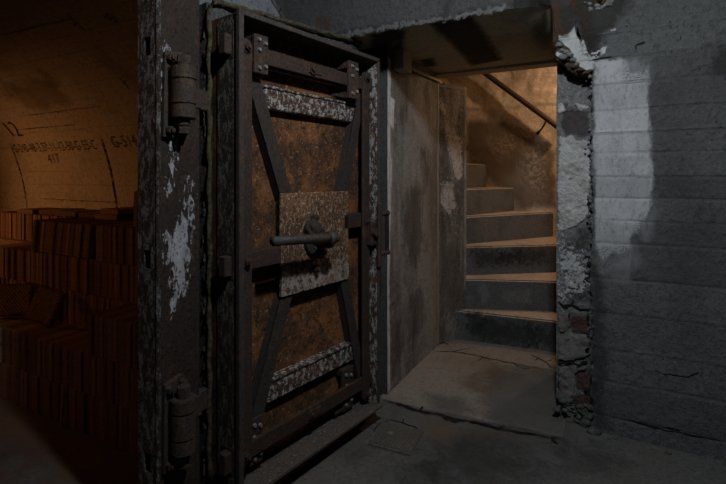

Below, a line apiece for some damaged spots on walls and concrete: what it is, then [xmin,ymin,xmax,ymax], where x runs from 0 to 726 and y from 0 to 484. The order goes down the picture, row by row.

spalling [342,3,506,38]
peeling [554,28,607,94]
peeling [164,139,179,198]
peeling [162,175,195,320]
flaking render [556,103,596,411]
crack [437,342,588,385]